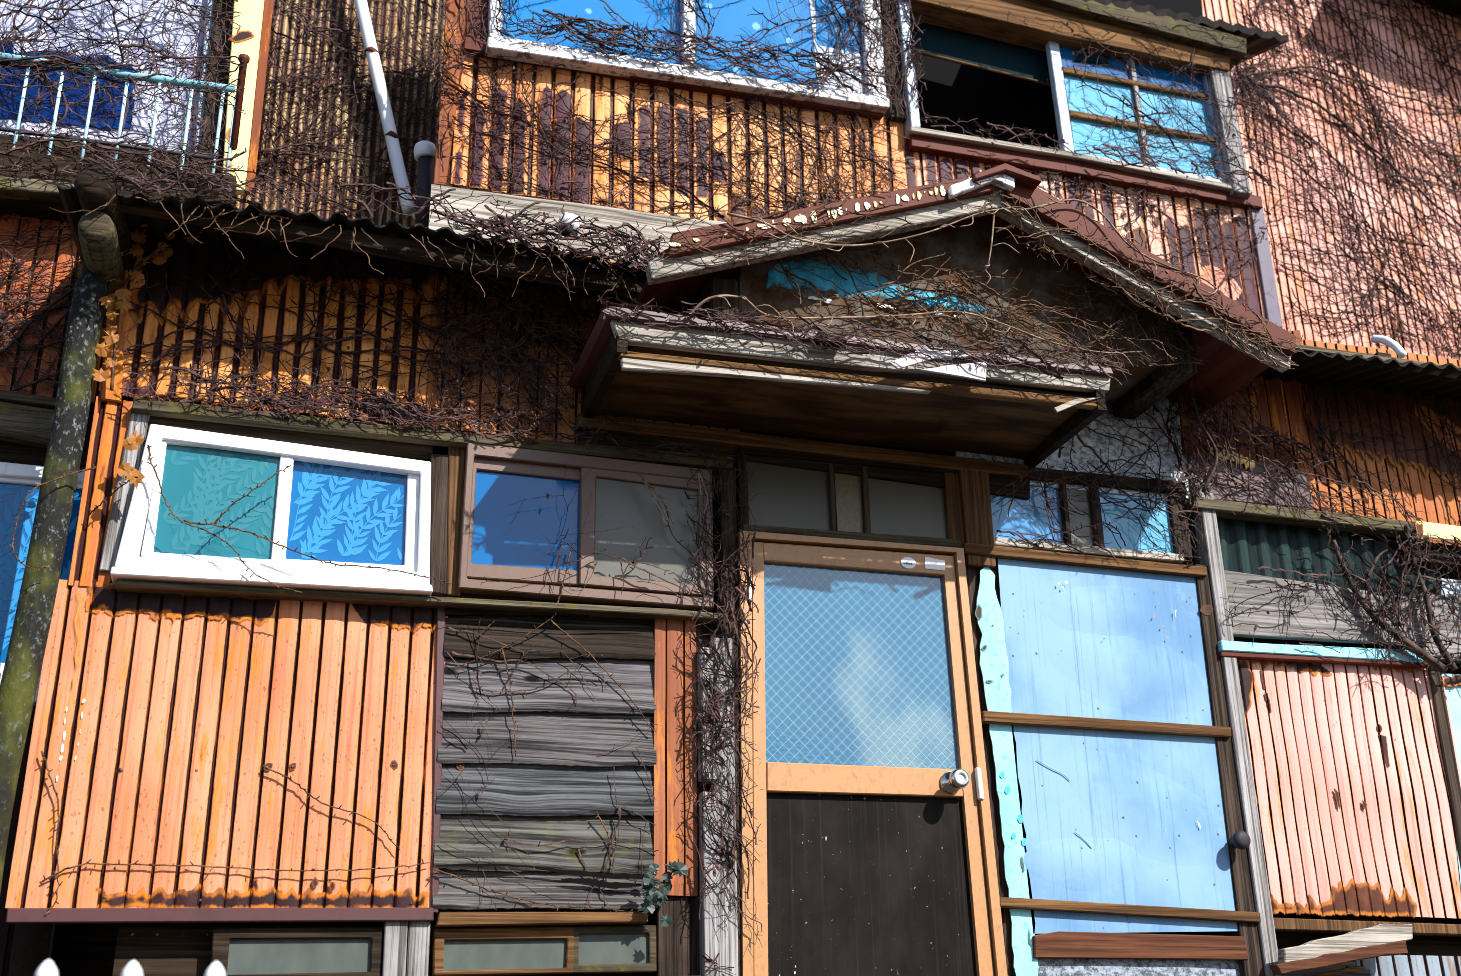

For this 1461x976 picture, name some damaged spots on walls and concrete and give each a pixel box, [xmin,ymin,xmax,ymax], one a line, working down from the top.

peeling [746,185,946,231]
corrosion [72,582,278,687]
corrosion [352,604,437,633]
corrosion [96,877,429,908]
corrosion [1270,878,1417,918]